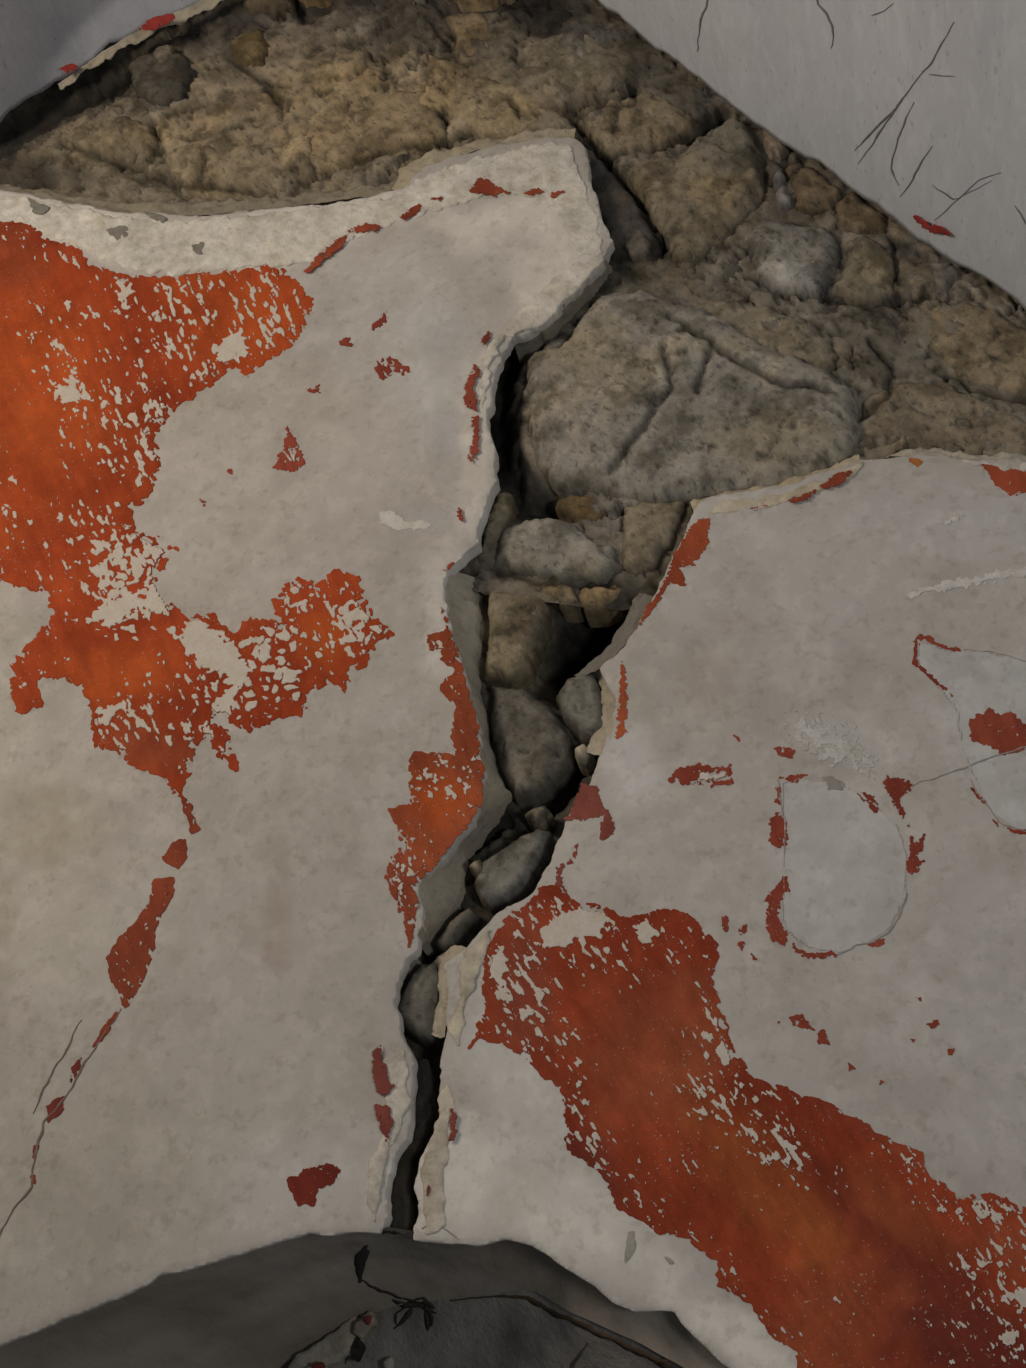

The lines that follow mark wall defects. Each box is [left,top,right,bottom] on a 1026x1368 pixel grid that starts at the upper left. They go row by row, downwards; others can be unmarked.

crack [697,0,708,52]
crack [816,0,834,49]
crack [854,22,999,219]
spalling [0,0,1026,1048]
crack [354,572,672,1368]
peeling [46,1058,82,1123]
peeling [372,1045,395,1142]
peeling [448,1108,458,1141]